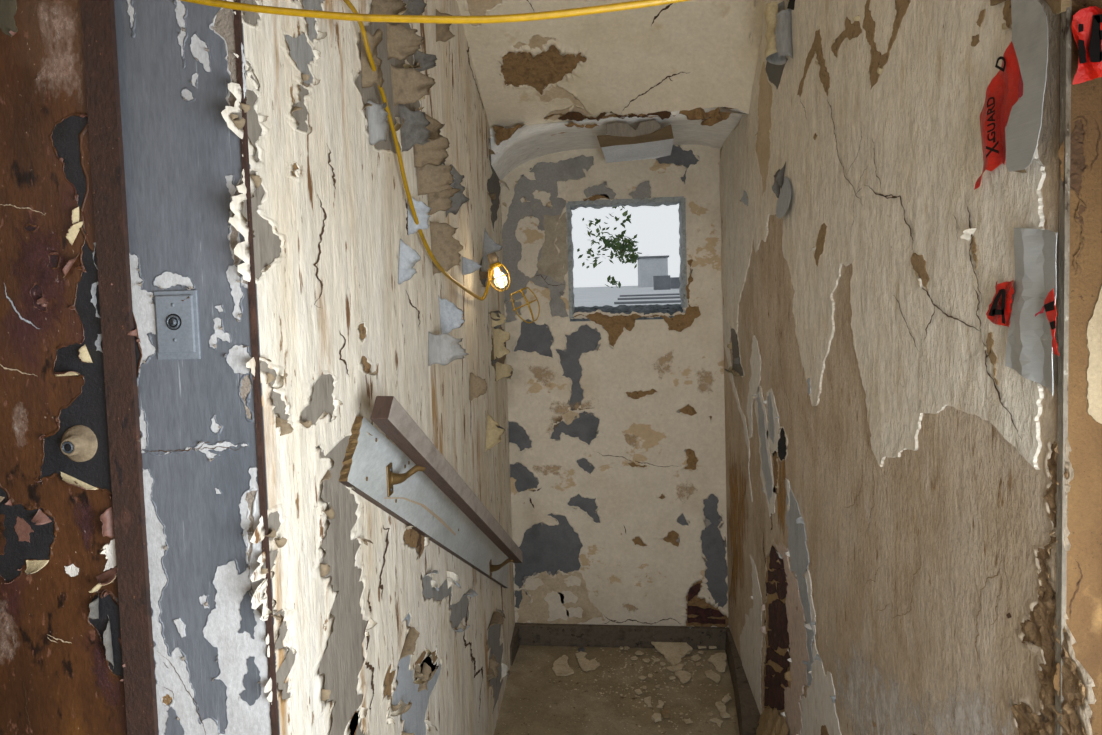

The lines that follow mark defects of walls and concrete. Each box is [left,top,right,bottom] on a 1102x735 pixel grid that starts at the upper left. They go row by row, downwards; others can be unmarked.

corrosion [38,7,76,81]
peeling [126,0,136,39]
peeling [128,252,195,394]
peeling [139,407,249,462]
peeling [174,0,343,436]
peeling [348,0,702,476]
peeling [485,0,1099,735]
crack [800,100,914,256]
crack [893,207,1022,440]
peeling [1085,285,1102,424]
peeling [143,466,300,735]
peeling [309,431,478,735]